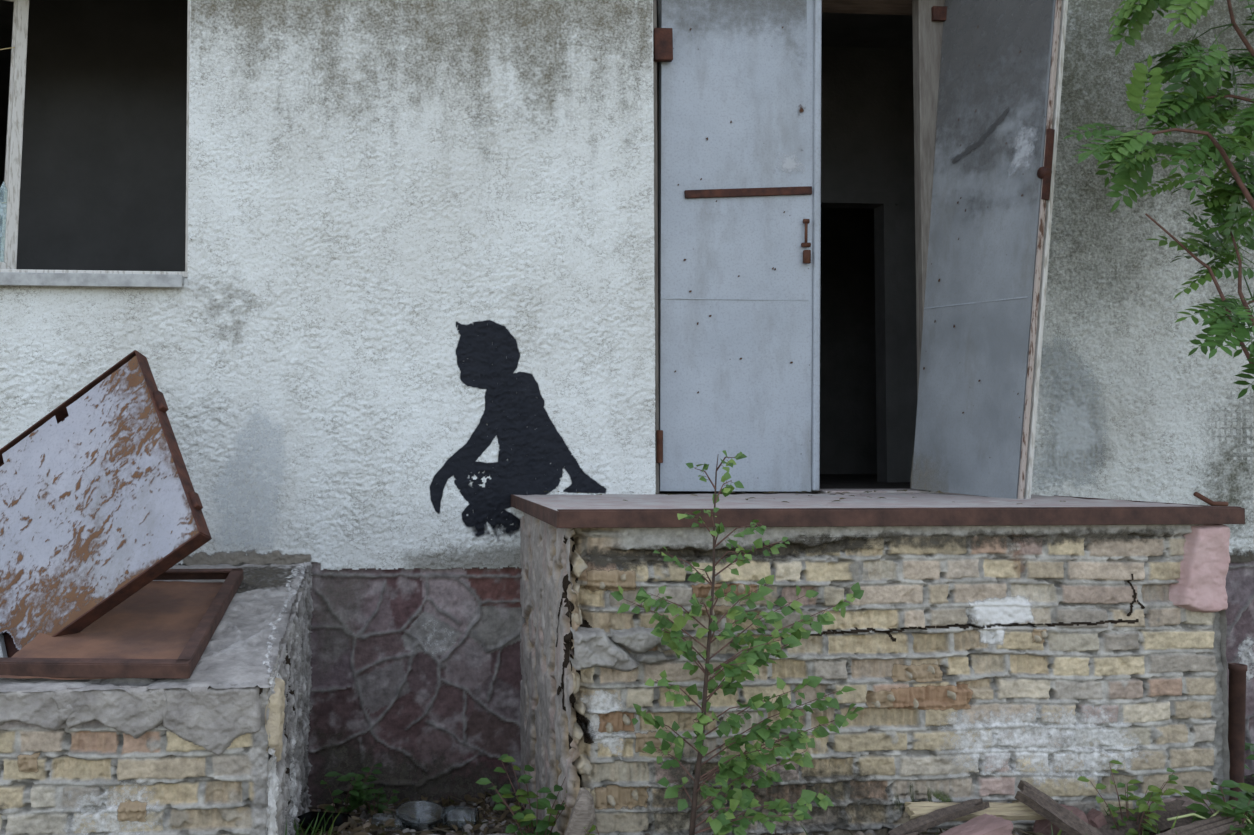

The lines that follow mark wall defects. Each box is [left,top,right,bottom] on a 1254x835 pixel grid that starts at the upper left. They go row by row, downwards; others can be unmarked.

leakage [191,0,652,115]
leakage [935,0,1053,170]
leakage [1051,0,1254,295]
corrosion [0,356,199,648]
spalling [584,569,636,592]
spalling [569,626,671,672]
leakage [966,595,1034,644]
spalling [0,665,299,835]
spalling [595,785,649,810]
spalling [598,711,671,753]